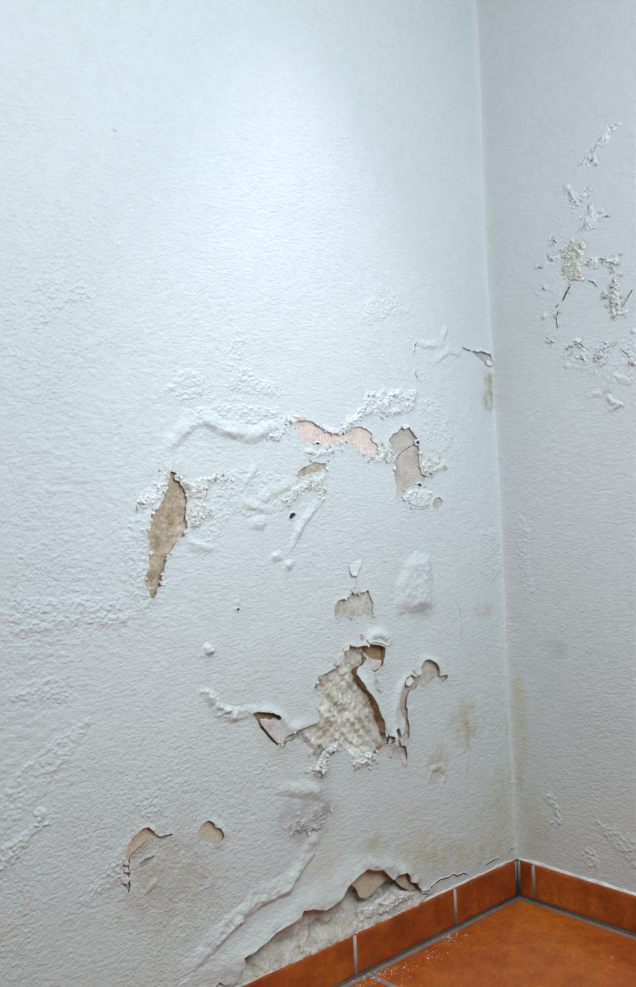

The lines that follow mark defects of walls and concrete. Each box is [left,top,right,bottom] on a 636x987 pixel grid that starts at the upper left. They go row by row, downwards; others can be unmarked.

peeling [534,183,628,321]
peeling [266,387,448,521]
flaking render [136,462,234,598]
flaking render [334,561,376,619]
flaking render [253,634,448,777]
flaking render [121,827,173,892]
flaking render [197,821,224,844]
flaking render [216,869,428,987]